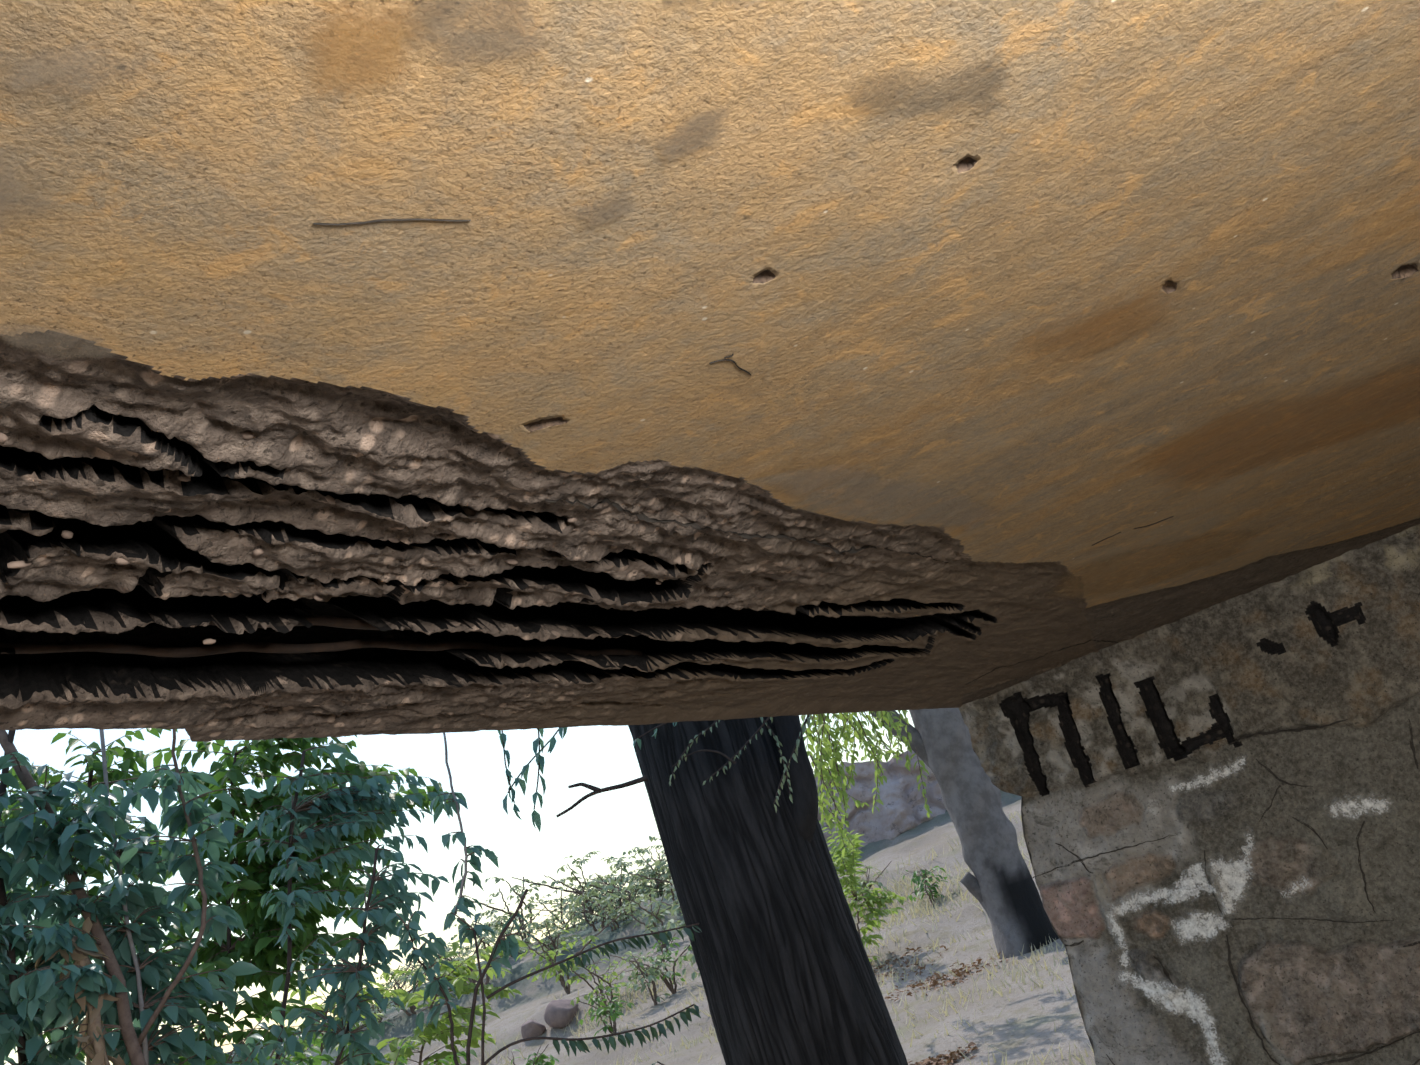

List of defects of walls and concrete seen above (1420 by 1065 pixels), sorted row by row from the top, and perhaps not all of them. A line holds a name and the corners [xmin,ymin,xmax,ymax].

spalling [0,330,1420,840]